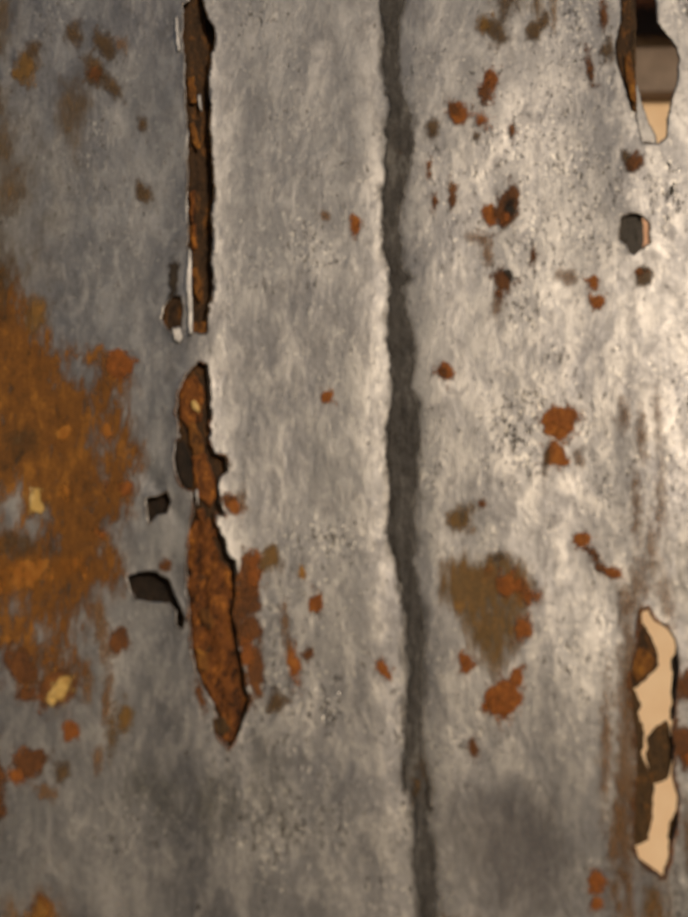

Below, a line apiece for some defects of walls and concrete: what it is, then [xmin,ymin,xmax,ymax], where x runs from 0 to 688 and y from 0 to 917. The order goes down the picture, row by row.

peeling [625,56,637,104]
rust [430,175,460,212]
rust [468,176,521,314]
rust [558,270,608,312]
rust [630,264,654,287]
rust [537,403,583,476]
rust [0,266,245,751]
rust [299,565,323,612]
rust [232,544,314,713]
rust [440,552,542,725]
rust [572,532,688,917]
rust [0,743,70,819]